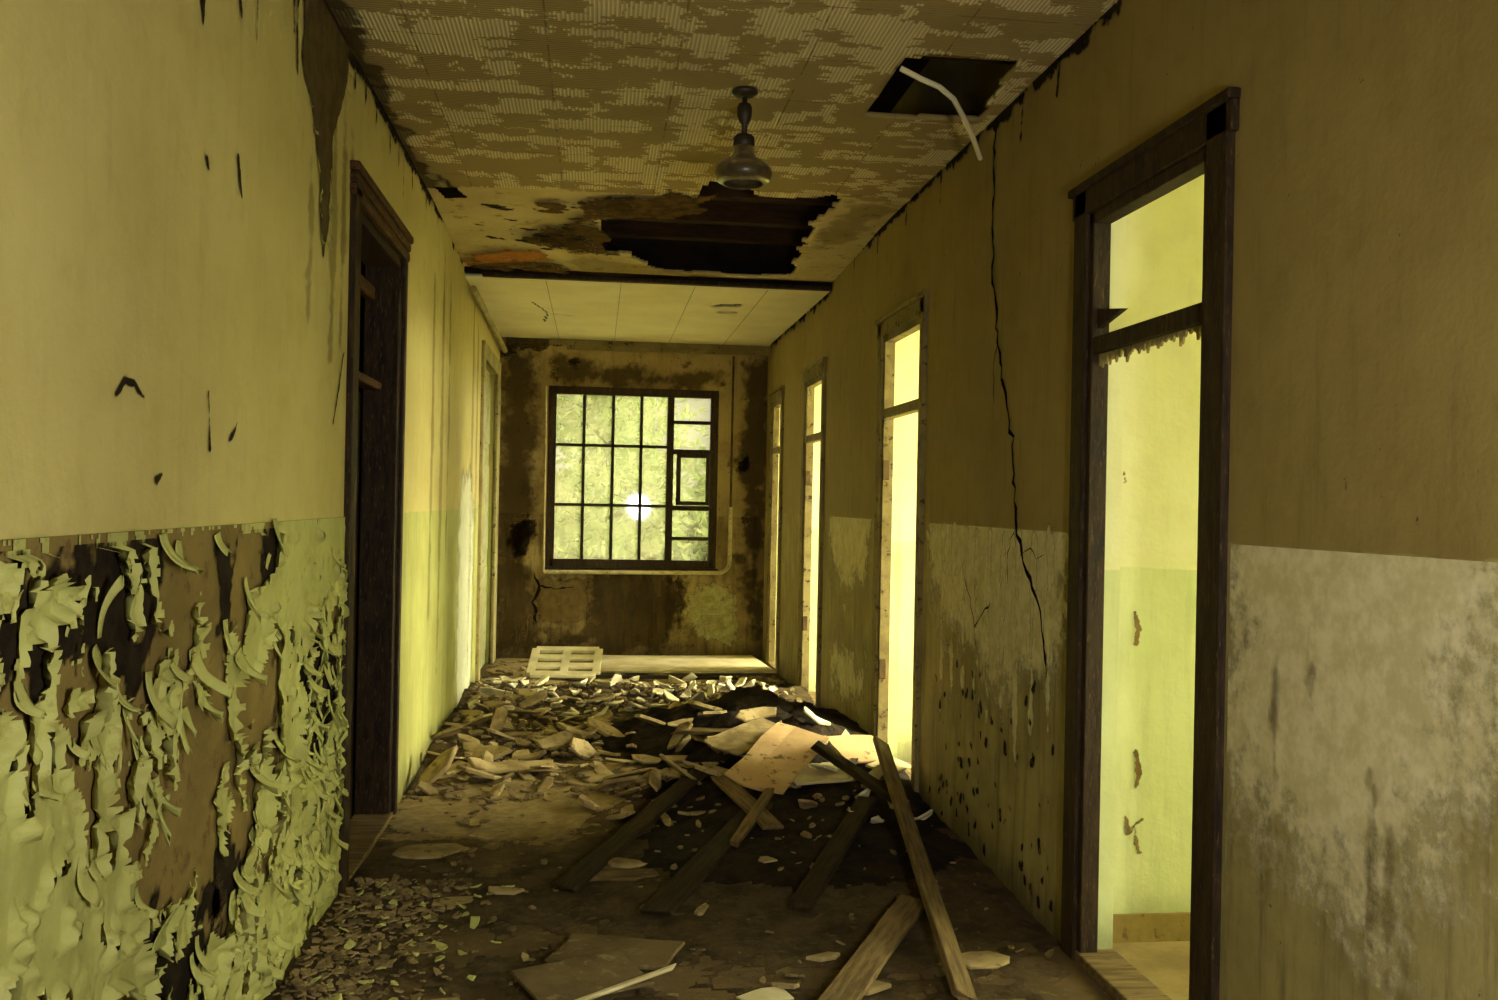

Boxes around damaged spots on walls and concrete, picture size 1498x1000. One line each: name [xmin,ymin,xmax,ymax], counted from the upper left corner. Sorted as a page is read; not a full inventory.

leakage [323,0,444,222]
flaking render [475,189,720,256]
leakage [496,337,725,655]
leakage [728,0,1122,641]
crack [961,130,1047,678]
peeling [0,517,349,1000]